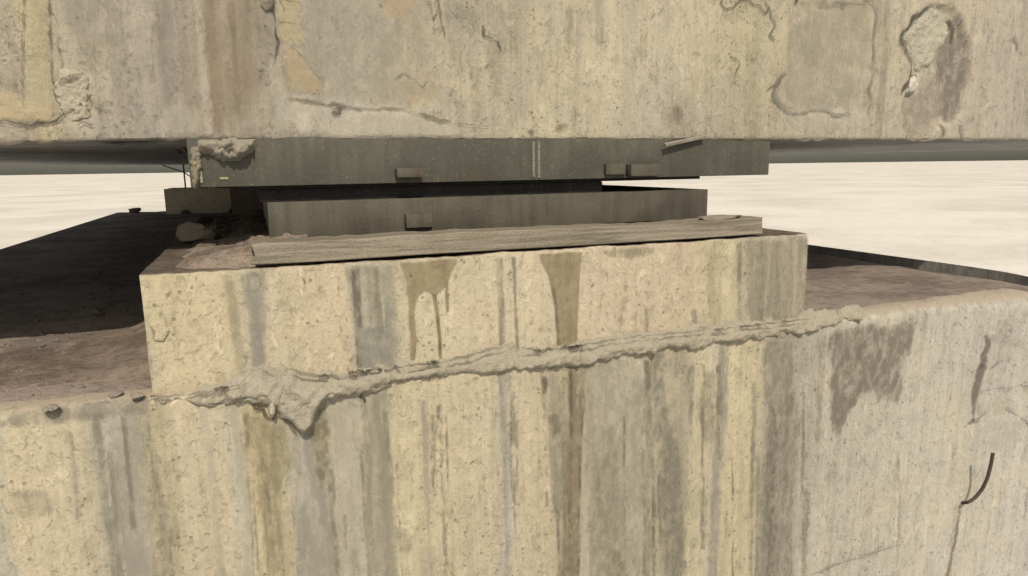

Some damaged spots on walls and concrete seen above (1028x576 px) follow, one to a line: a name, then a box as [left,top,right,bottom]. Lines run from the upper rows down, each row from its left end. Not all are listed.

crack [0,0,63,127]
peeling [260,0,362,115]
crack [720,0,779,42]
spalling [901,6,968,138]
leakage [347,259,457,368]
leakage [540,252,582,346]
leakage [818,322,914,433]
leakage [542,352,687,576]
leakage [688,346,734,576]
leakage [751,341,810,576]